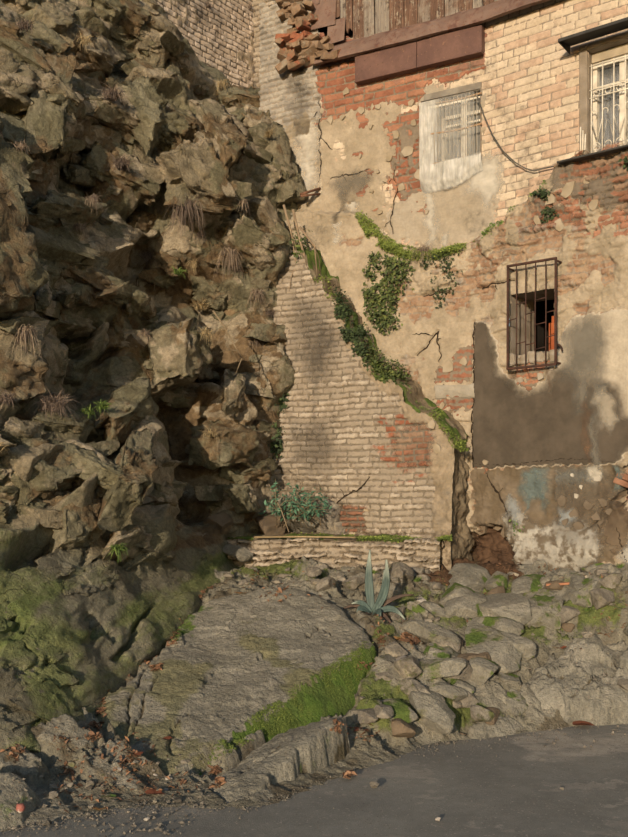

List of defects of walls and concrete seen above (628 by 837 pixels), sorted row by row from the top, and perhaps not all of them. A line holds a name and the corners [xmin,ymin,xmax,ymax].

spalling [314,57,486,215]
crack [314,101,398,232]
spalling [527,141,628,232]
crack [412,331,442,361]
spalling [434,344,475,385]
spalling [432,395,475,416]
crack [470,322,628,513]
spalling [394,419,441,468]
crack [586,520,627,562]